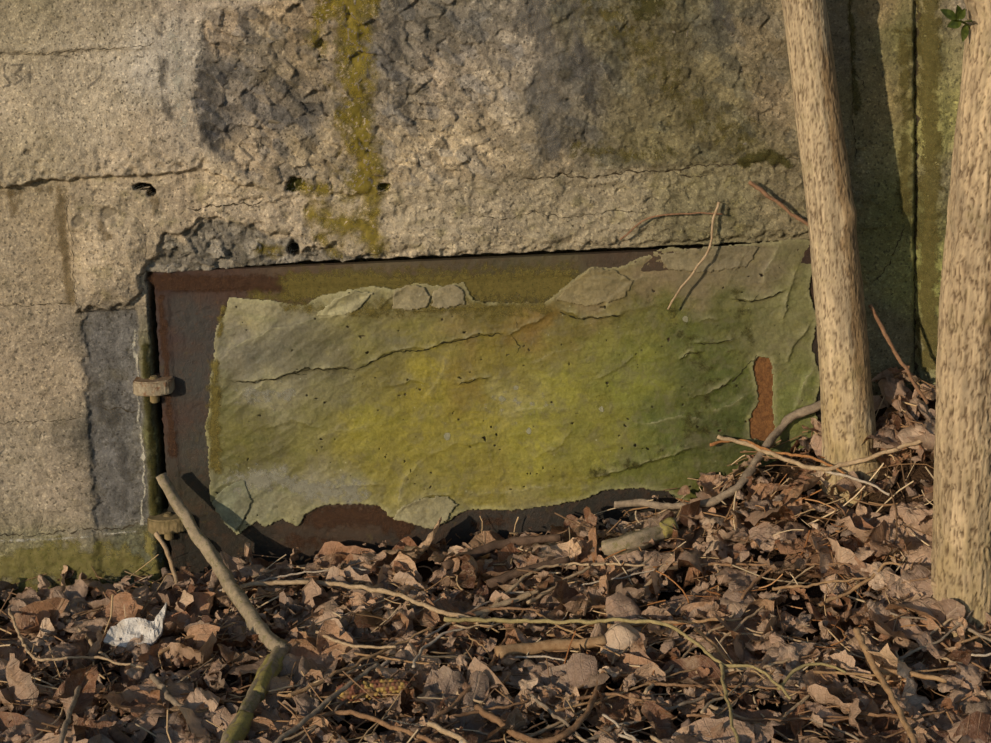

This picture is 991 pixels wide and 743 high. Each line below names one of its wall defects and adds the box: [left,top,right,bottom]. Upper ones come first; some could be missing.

leakage [311,0,335,49]
corrosion [149,271,287,377]
peeling [205,239,820,535]
corrosion [745,356,775,441]